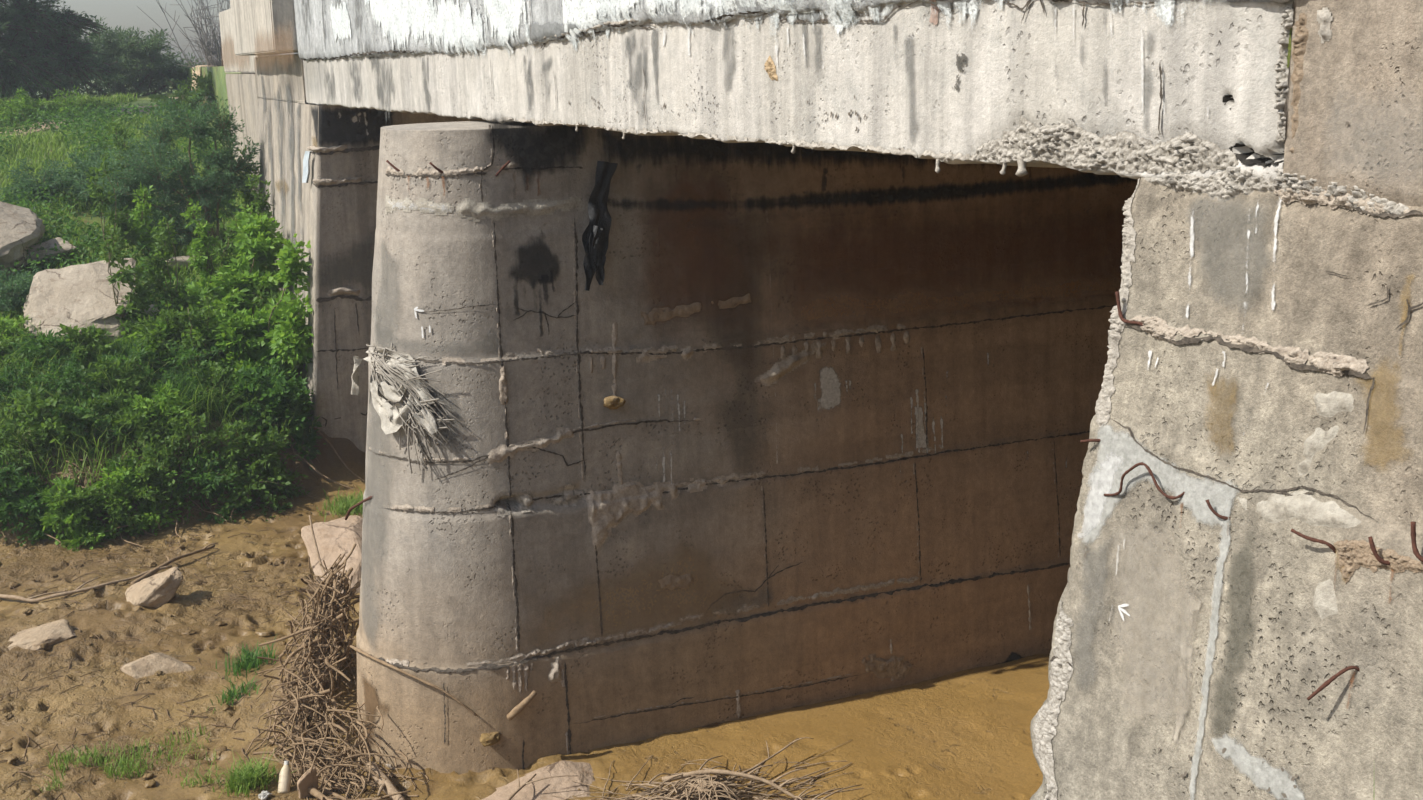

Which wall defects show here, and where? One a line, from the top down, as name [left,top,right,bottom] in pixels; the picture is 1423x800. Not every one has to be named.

leakage [775,8,820,66]
spalling [499,114,1409,443]
crack [1109,418,1377,522]
spalling [1032,600,1074,800]